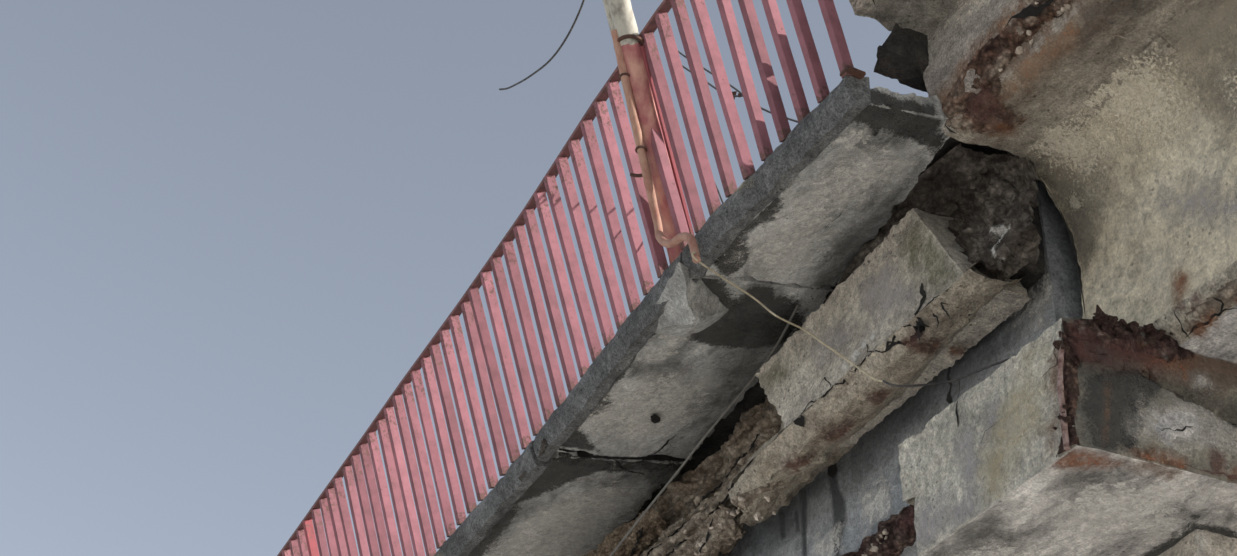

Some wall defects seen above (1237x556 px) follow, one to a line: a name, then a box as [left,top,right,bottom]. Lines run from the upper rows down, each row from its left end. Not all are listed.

crack [1005,0,1064,28]
spalling [941,0,1133,137]
peeling [1028,45,1207,215]
water stain [677,89,947,396]
crack [805,283,950,411]
crack [537,435,690,475]
crack [630,428,761,556]
spalling [667,481,787,556]
water stain [732,269,1053,556]